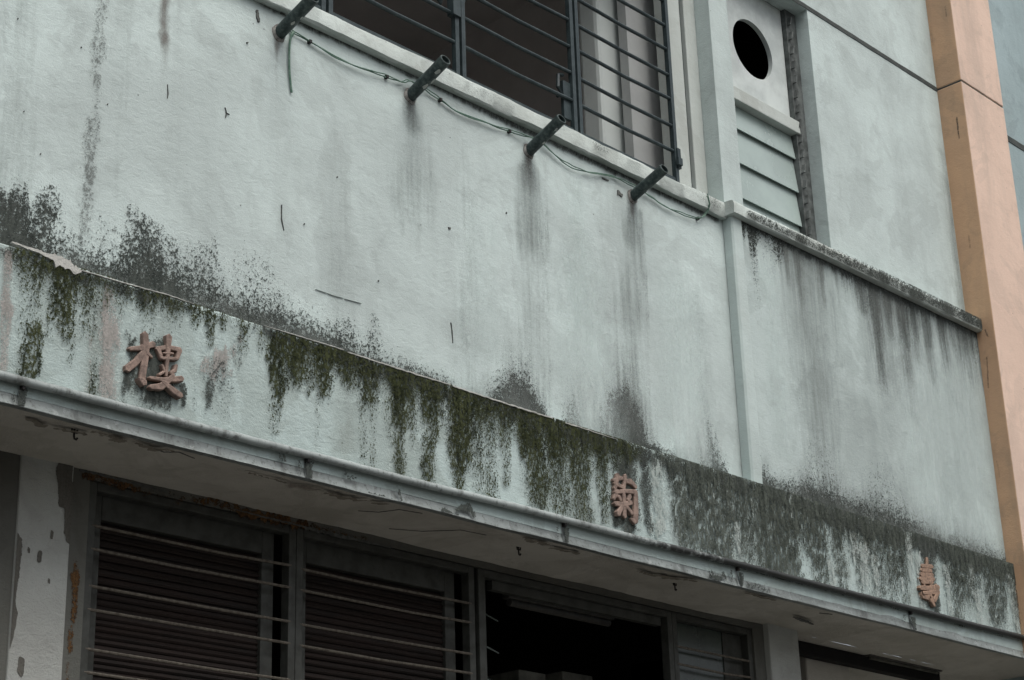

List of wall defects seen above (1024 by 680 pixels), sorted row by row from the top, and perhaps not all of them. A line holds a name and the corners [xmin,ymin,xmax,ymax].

damp [90,0,107,107]
peeling [11,241,194,304]
damp [0,113,1021,633]
peeling [50,463,73,544]
peeling [17,657,25,677]
peeling [10,534,42,647]
corrosion [66,563,80,680]